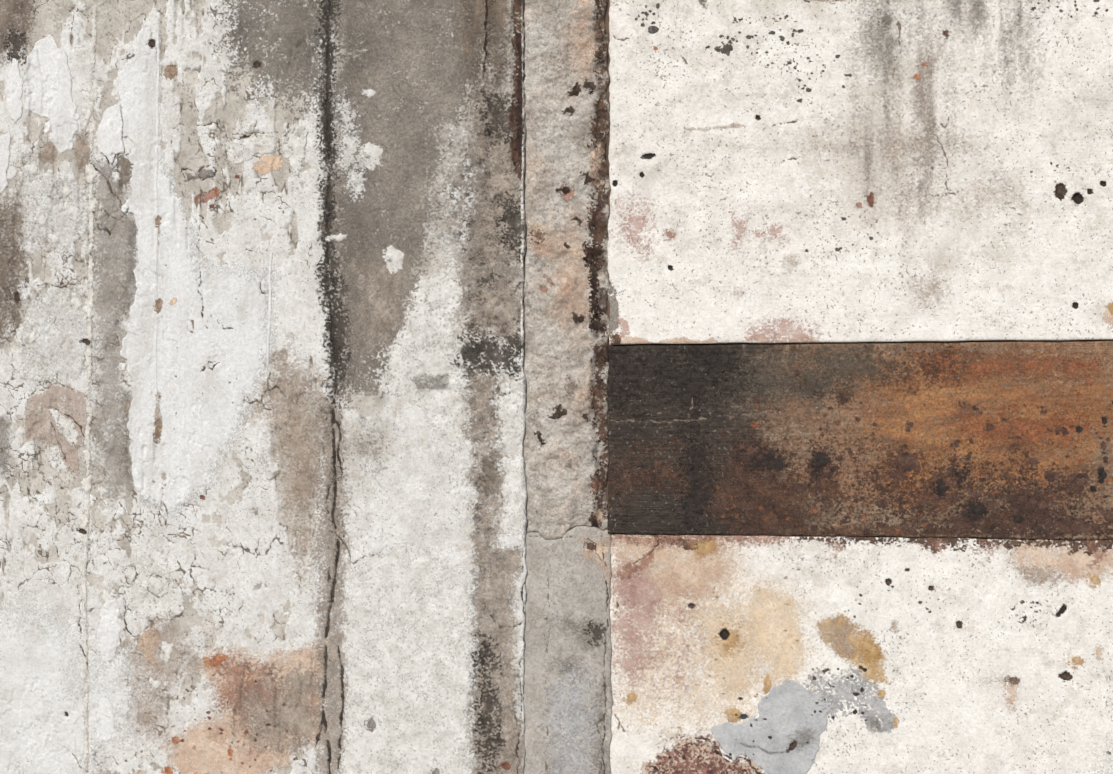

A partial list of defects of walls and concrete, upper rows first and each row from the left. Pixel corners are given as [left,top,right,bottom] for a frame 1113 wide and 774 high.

peeling [0,0,383,565]
crack [315,0,382,774]
water stain [313,0,525,774]
corrosion [528,0,1113,725]
water stain [878,14,892,62]
corrosion [123,612,329,774]
peeling [641,665,895,774]